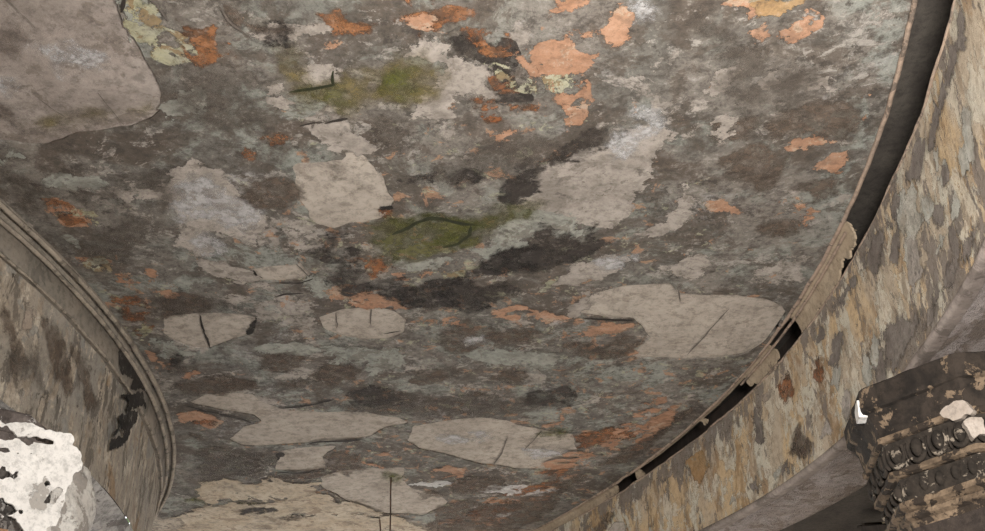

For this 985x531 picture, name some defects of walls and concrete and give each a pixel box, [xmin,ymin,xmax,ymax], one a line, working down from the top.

peeling [247,21,344,87]
damp [224,0,439,111]
damp [632,2,653,18]
peeling [40,157,351,299]
flaking render [148,313,257,360]
flaking render [252,307,406,376]
flaking render [292,99,394,228]
damp [312,222,637,355]
peeling [468,124,681,264]
flaking render [552,253,785,359]
peeling [832,5,977,386]
flaking render [184,393,577,515]